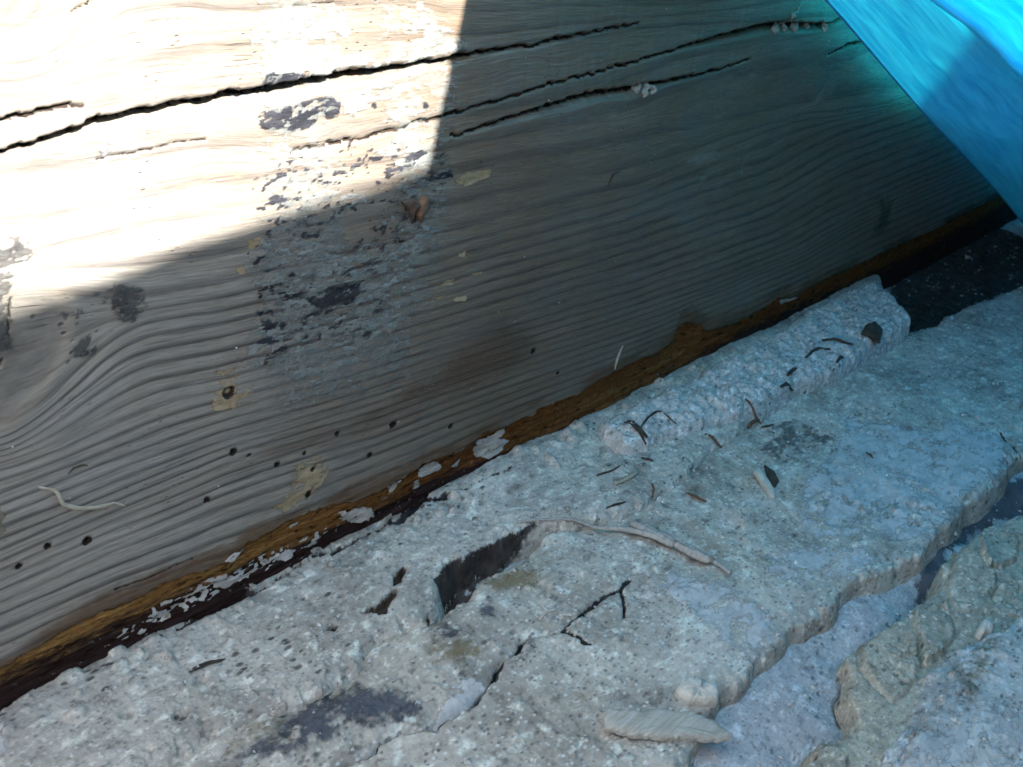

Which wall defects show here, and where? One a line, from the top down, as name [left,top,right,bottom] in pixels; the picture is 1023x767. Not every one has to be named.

peeling [251,0,464,78]
crack [0,22,638,152]
peeling [340,84,416,121]
crack [290,17,840,154]
crack [96,138,206,160]
peeling [374,131,436,168]
peeling [236,184,432,411]
peeling [212,368,253,411]
crack [242,466,511,601]
spalling [364,567,406,615]
crack [560,580,631,646]
crack [351,638,533,766]